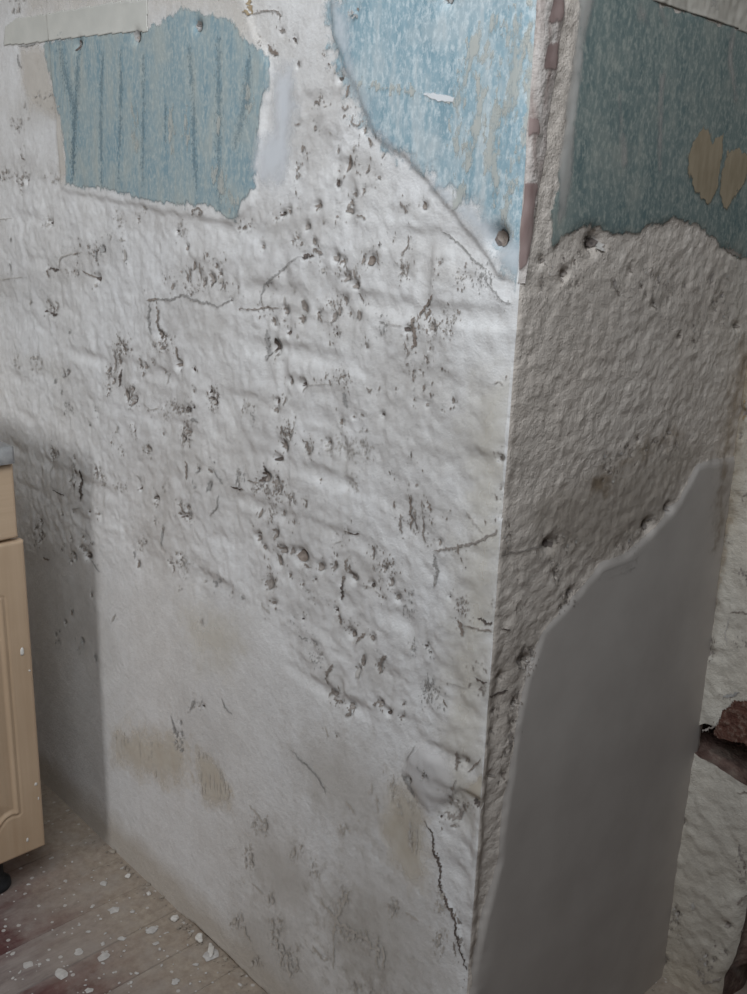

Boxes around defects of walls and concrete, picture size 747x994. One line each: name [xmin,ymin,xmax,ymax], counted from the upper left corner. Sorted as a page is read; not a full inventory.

peeling [10,7,279,251]
peeling [272,145,308,222]
peeling [311,0,747,313]
peeling [162,252,239,299]
spalling [264,241,383,360]
spalling [403,258,461,409]
spalling [702,683,747,746]
crack [424,821,467,970]